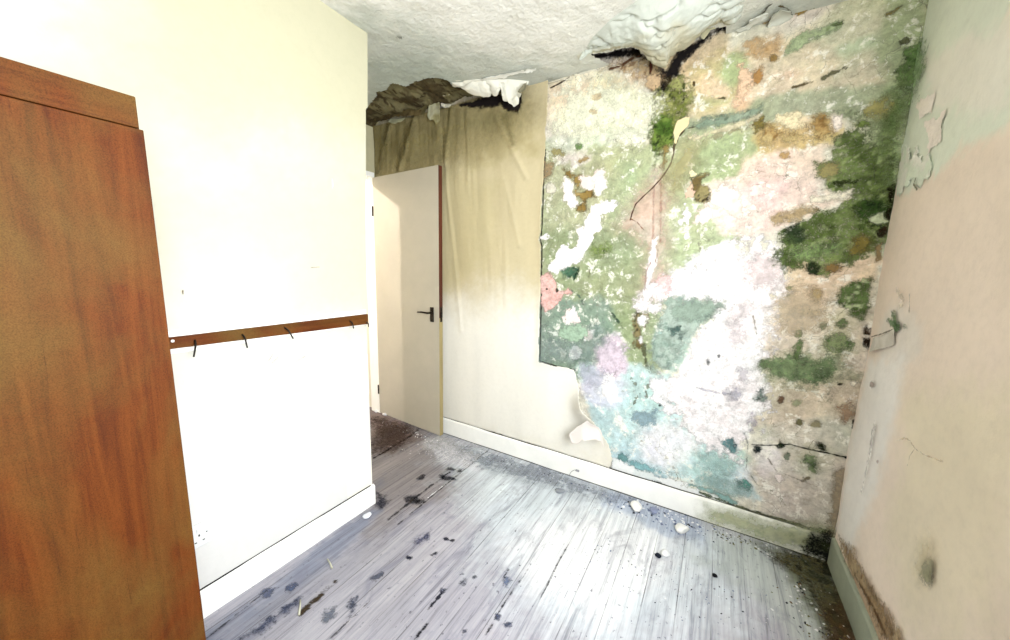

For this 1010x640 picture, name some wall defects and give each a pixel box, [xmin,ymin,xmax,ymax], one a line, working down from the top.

peeling [370,94,451,124]
damp [373,108,521,169]
peeling [896,36,946,197]
peeling [547,169,618,275]
peeling [678,170,745,240]
damp [638,37,923,464]
peeling [548,305,595,361]
peeling [611,457,832,535]
crack [744,433,847,534]
damp [709,511,901,640]